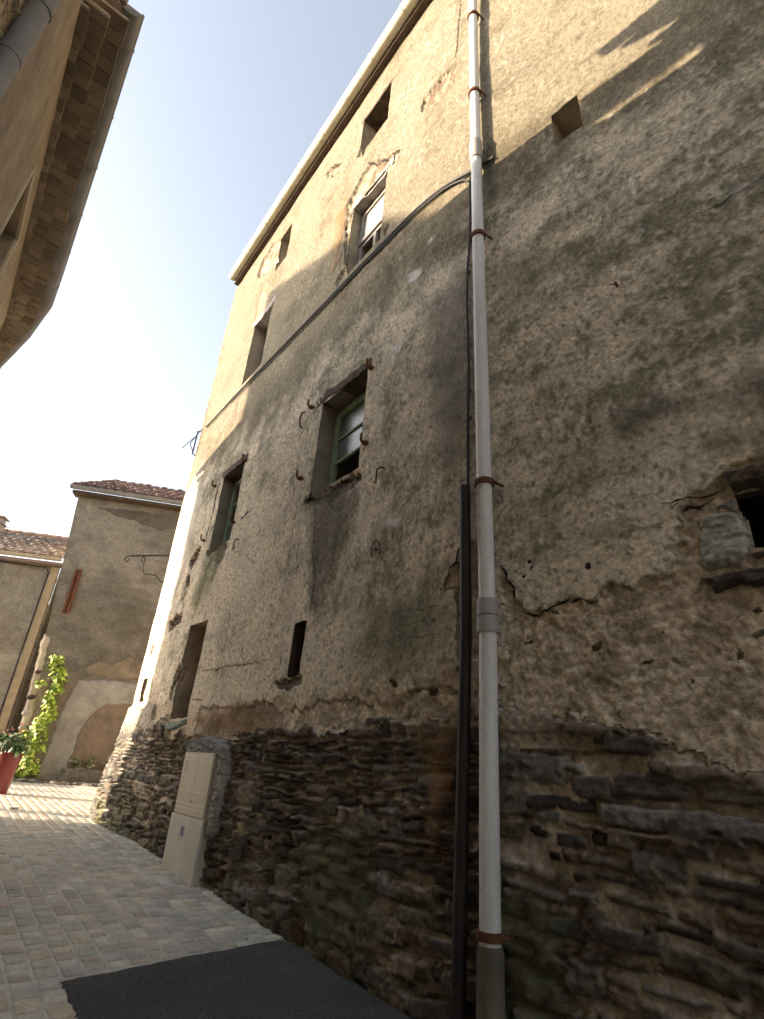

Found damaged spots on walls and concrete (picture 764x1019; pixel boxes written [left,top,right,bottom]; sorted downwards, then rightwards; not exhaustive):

crack [500,565,601,617]
flaking render [499,455,764,777]
flaking render [275,676,302,691]
flaking render [195,680,458,739]